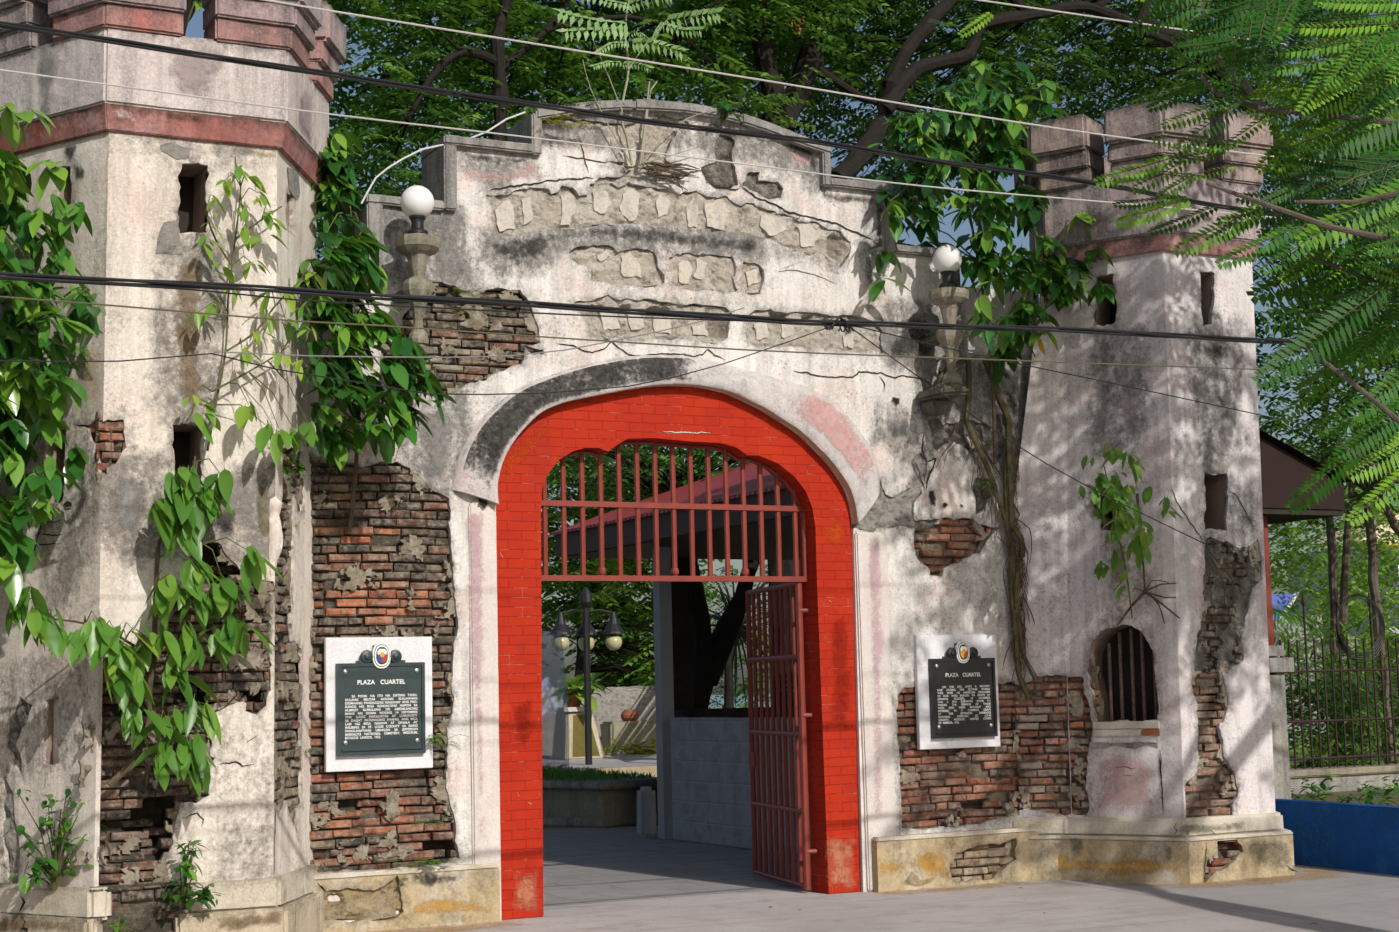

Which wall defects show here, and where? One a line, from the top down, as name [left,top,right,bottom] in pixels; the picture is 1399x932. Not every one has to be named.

spalling [487,116,850,283]
spalling [381,282,542,396]
spalling [569,245,881,353]
spalling [79,412,126,480]
spalling [851,414,1005,576]
spalling [73,448,458,932]
spalling [896,666,1158,830]
spalling [1185,538,1261,817]
spalling [903,841,1015,887]